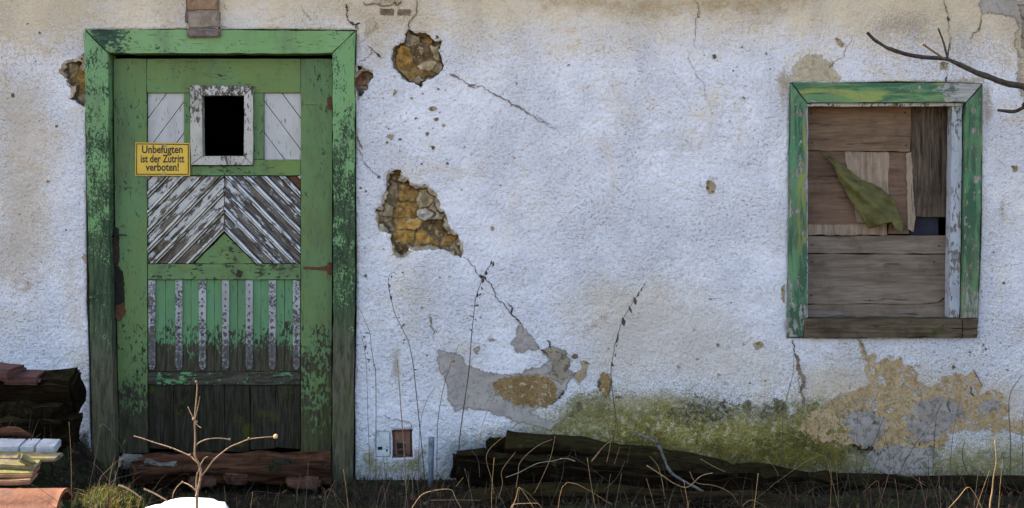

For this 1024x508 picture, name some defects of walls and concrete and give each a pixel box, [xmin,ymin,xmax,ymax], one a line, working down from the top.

spalling [58,53,86,109]
spalling [355,65,374,102]
spalling [379,30,446,99]
crack [450,74,560,134]
spalling [375,170,464,258]
crack [463,257,551,356]
flaking render [426,325,590,430]
flaking render [598,372,621,399]
damp [562,394,846,472]
crack [792,340,806,407]
flaking render [796,340,1024,476]